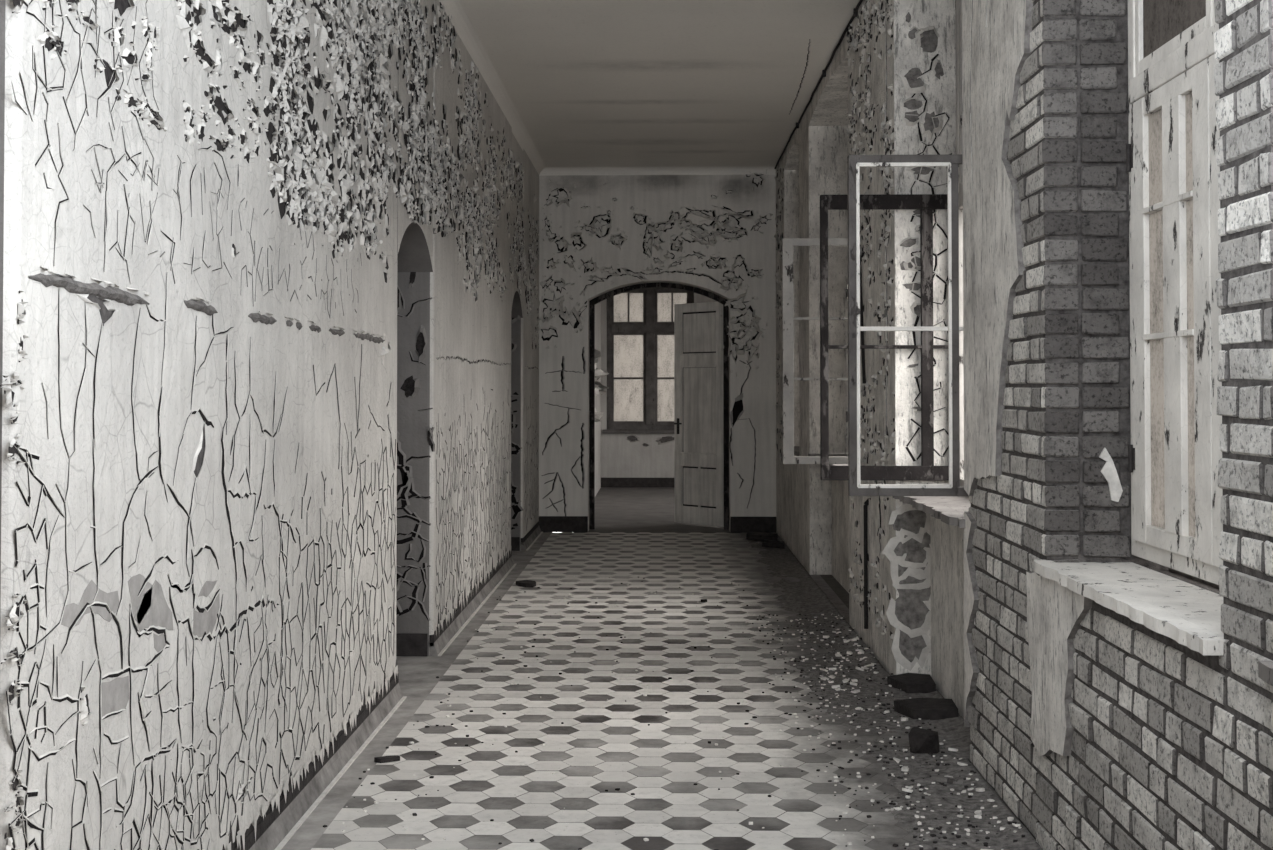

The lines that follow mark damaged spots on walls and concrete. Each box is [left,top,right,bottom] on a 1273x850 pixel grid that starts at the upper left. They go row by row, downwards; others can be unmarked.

peeling [37,24,68,59]
peeling [42,0,167,131]
peeling [845,0,944,195]
flaking render [76,294,120,330]
crack [6,0,586,850]
peeling [400,325,428,398]
peeling [176,0,784,378]
peeling [846,209,934,671]
spalling [969,0,1033,496]
peeling [61,574,173,652]
flaking render [792,630,908,723]
spalling [1043,597,1093,756]